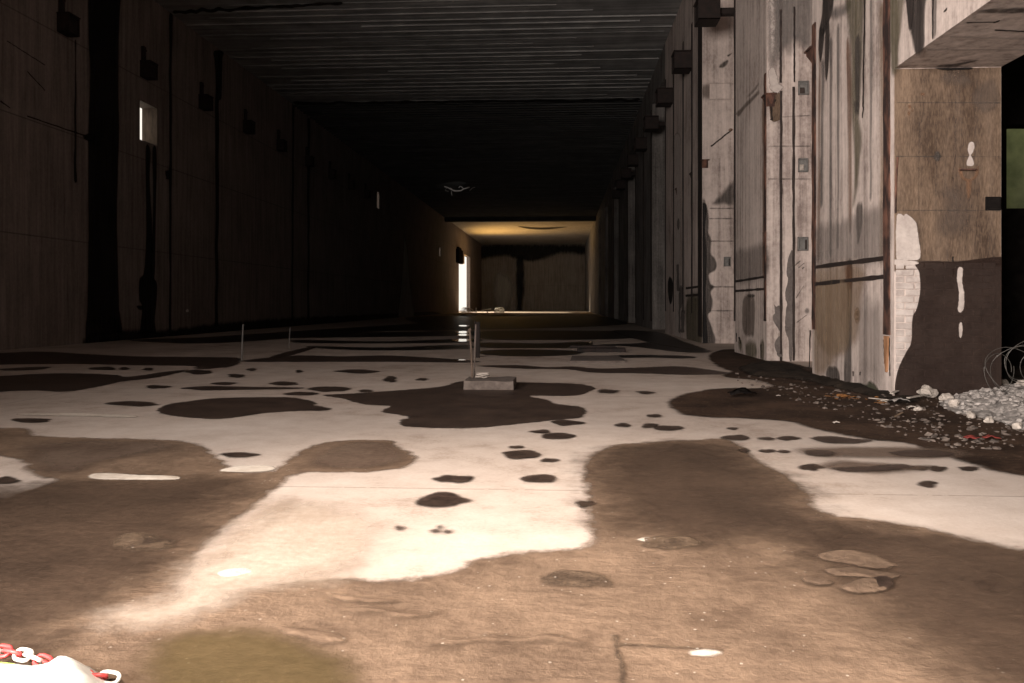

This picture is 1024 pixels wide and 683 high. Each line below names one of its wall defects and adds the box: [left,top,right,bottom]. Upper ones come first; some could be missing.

leakage [0,0,1024,475]
peeling [895,214,921,266]
leakage [0,428,1024,683]